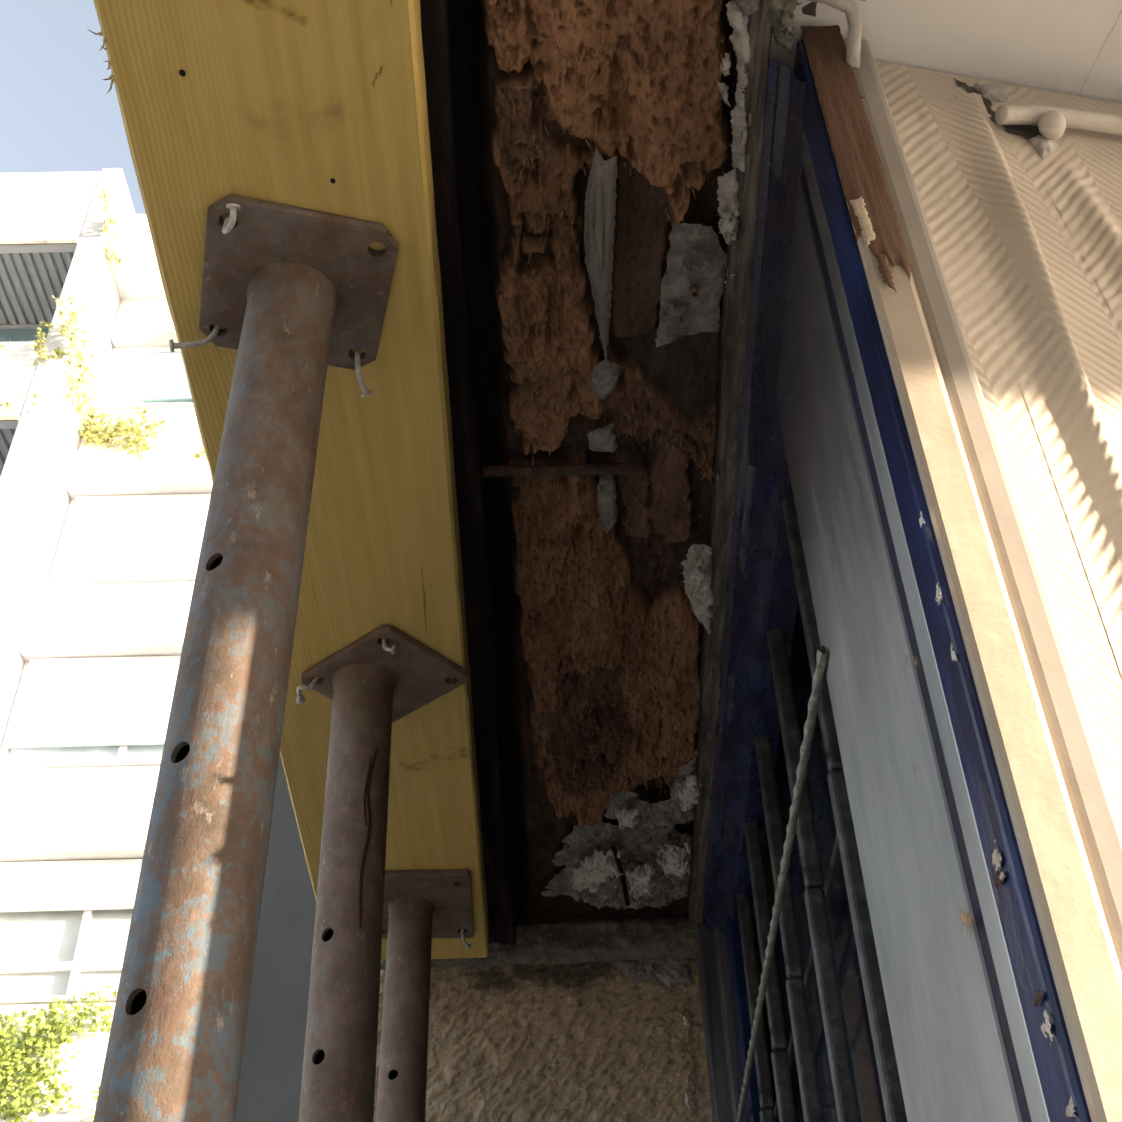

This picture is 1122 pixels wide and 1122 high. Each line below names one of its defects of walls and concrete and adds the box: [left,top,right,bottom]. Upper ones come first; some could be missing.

crack [1078,9,1122,96]
spalling [954,78,1061,159]
peeling [655,0,912,347]
flaking render [590,359,620,400]
flaking render [587,424,618,452]
flaking render [597,484,618,534]
flaking render [681,544,719,634]
flaking render [541,750,702,910]
peeling [991,840,1005,888]
peeling [1033,989,1054,1045]
peeling [1066,1096,1076,1117]